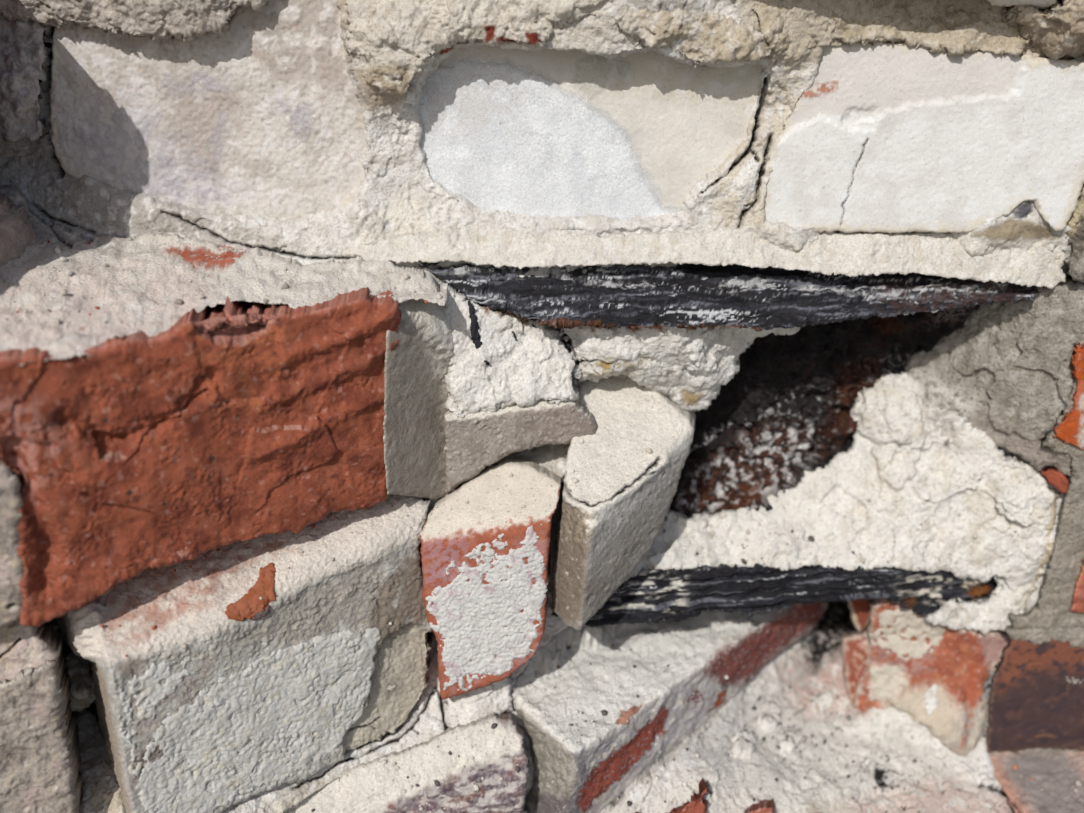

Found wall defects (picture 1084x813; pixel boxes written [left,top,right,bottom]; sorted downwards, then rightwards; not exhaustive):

crack [711,77,771,228]
crack [29,210,96,248]
crack [161,211,350,259]
spalling [669,304,980,518]
rust [820,362,879,456]
rust [731,479,768,509]
peeling [426,525,548,692]